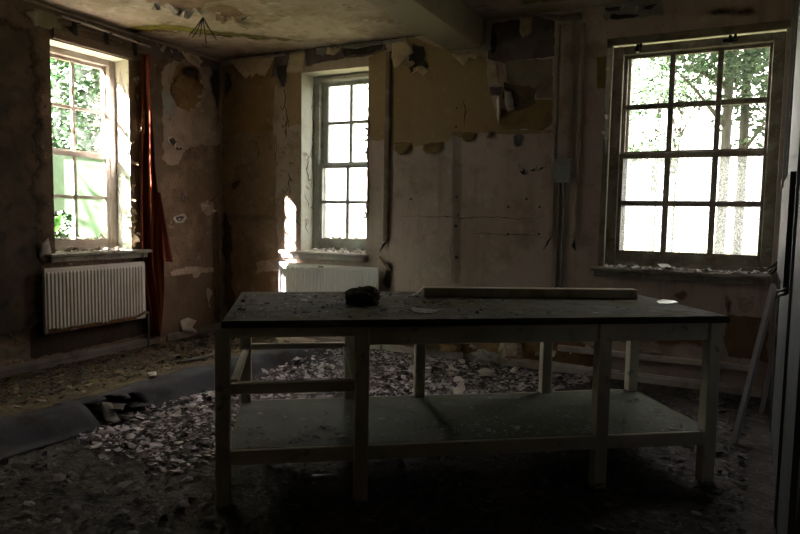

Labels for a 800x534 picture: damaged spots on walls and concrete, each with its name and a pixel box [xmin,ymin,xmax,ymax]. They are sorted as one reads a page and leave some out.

peeling [152,1,203,19]
flaking render [403,44,428,75]
peeling [481,16,555,64]
peeling [161,59,221,166]
flaking render [490,82,553,131]
peeling [254,52,313,292]
flaking render [160,266,220,337]